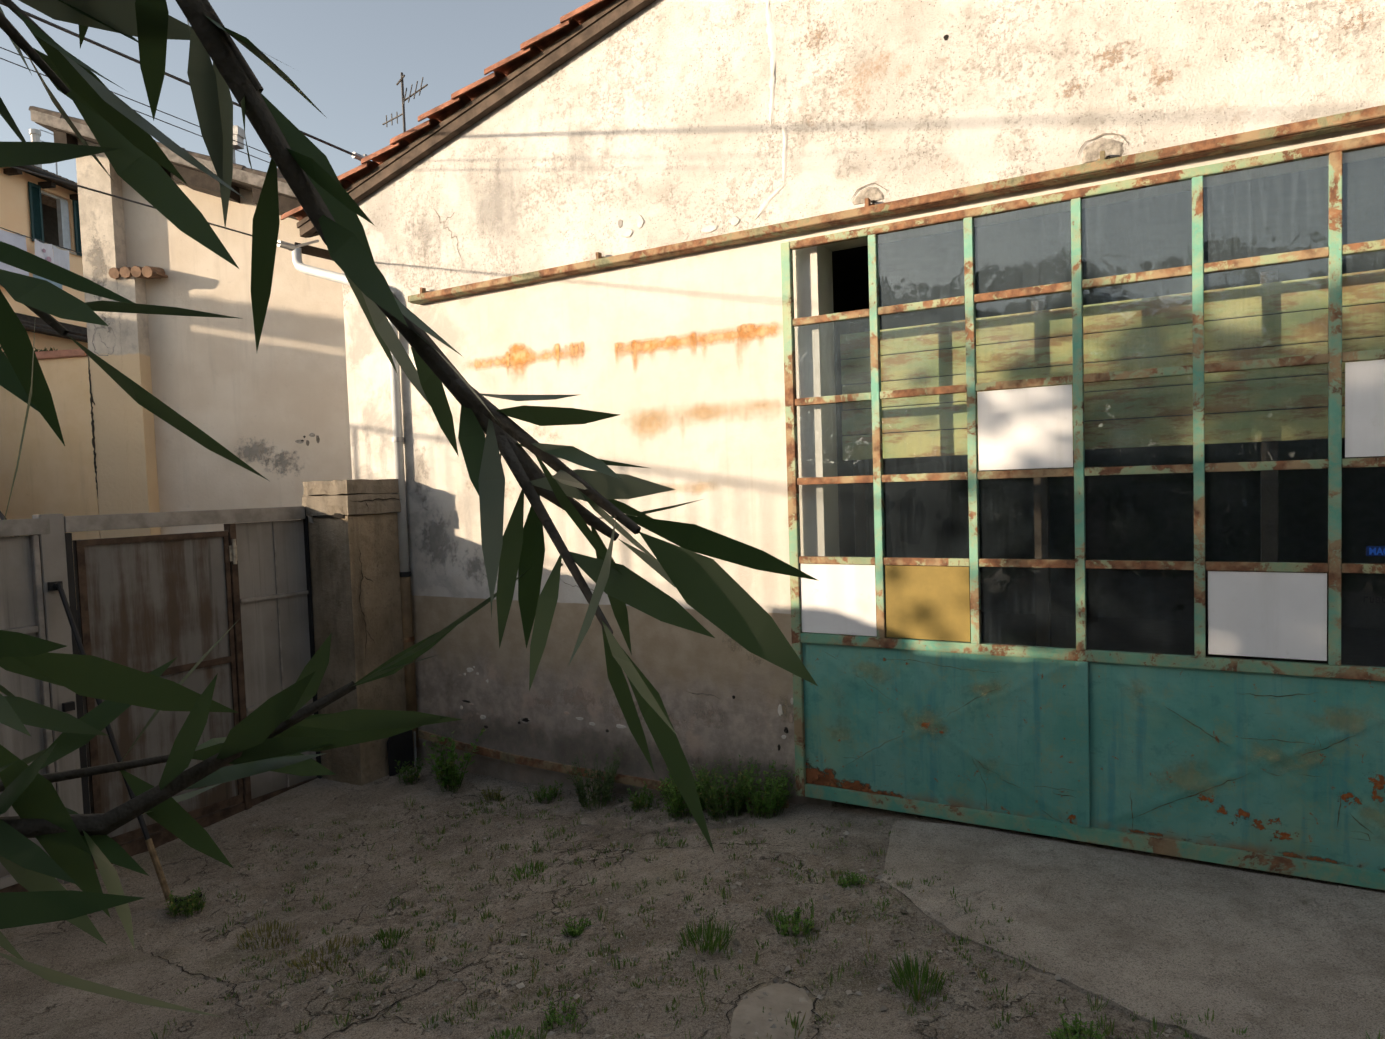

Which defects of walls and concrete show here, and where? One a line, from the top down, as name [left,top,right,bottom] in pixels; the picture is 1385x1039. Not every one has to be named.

rust [474,343,583,370]
rust [615,325,777,360]
rust [806,760,903,798]
rust [1338,774,1385,805]
rust [1197,794,1342,864]